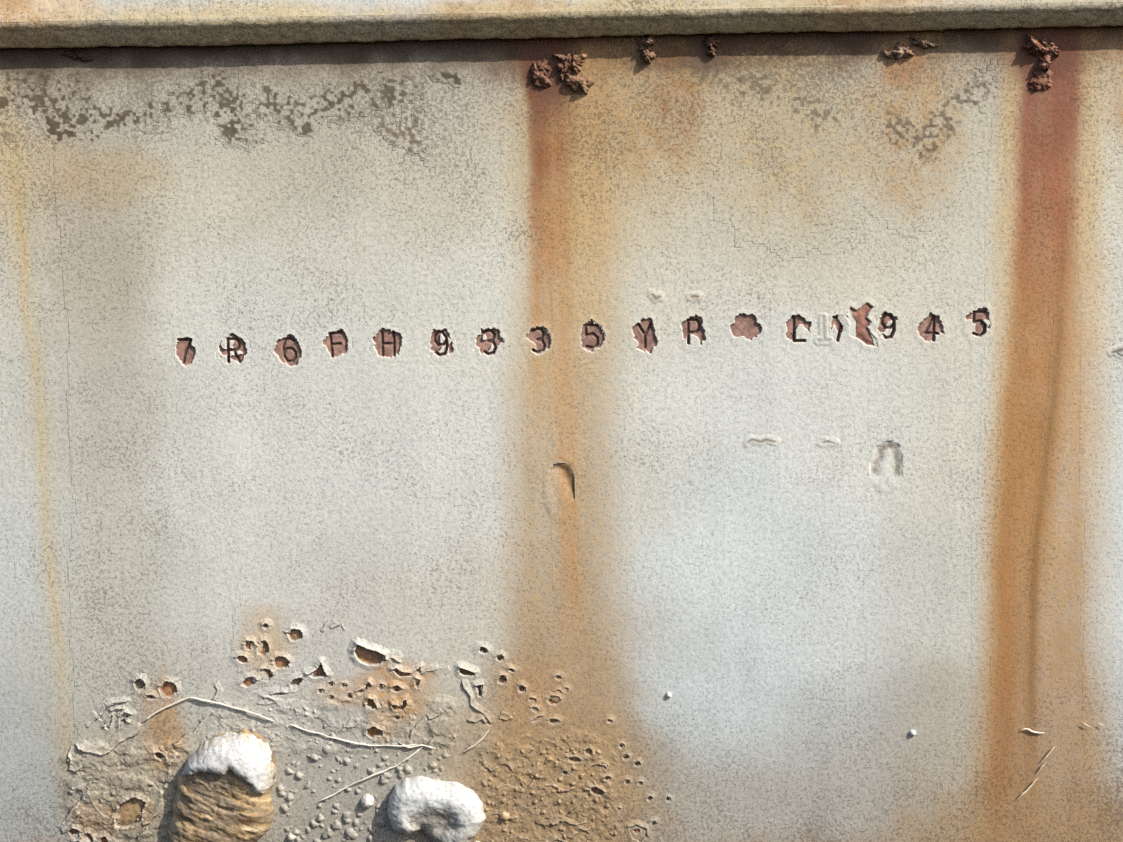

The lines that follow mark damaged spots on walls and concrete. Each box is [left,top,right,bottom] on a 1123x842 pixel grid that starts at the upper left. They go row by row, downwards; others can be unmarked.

mould [675,50,845,139]
mould [872,58,1006,171]
water stain [0,61,467,753]
rust [450,26,1123,842]
peeling [67,672,184,772]
peeling [56,711,226,842]
peeling [228,618,426,741]
peeling [453,640,574,729]
peeling [558,714,677,842]